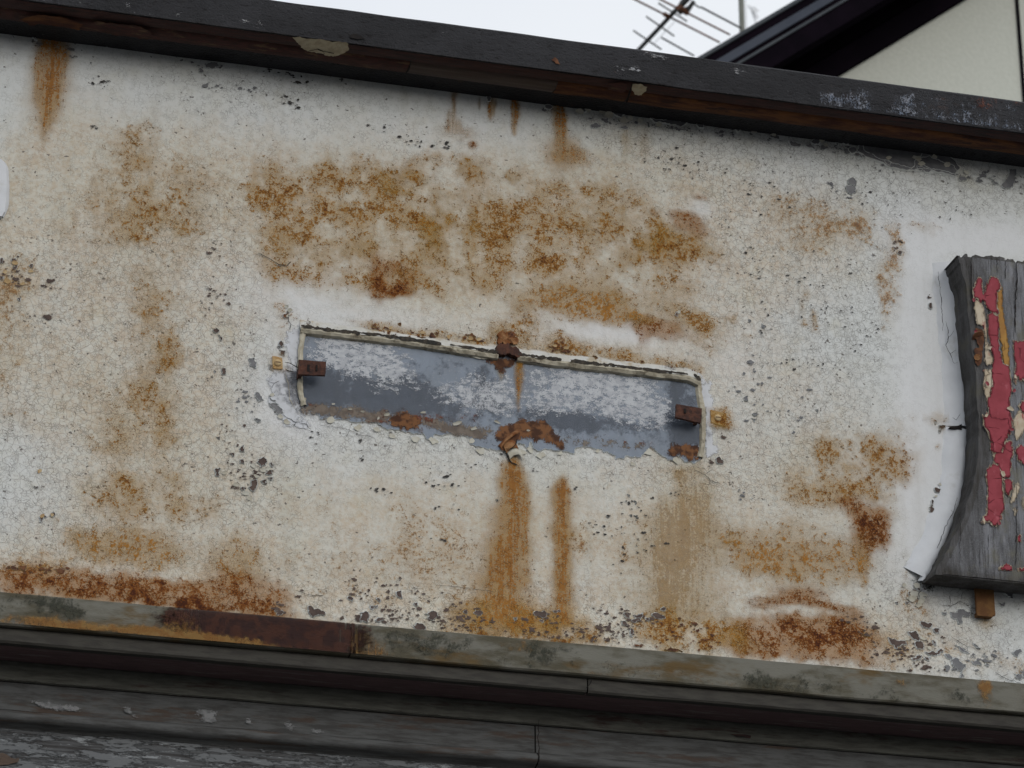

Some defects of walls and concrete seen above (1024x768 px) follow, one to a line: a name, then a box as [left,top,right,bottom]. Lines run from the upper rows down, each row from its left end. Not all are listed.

rust [31,39,69,140]
rust [545,106,590,168]
rust [226,130,736,404]
rust [0,253,383,655]
peeling [248,320,724,472]
rust [495,418,567,450]
rust [369,457,610,650]
peeling [588,494,670,574]
rust [628,429,935,684]
rust [978,680,992,701]